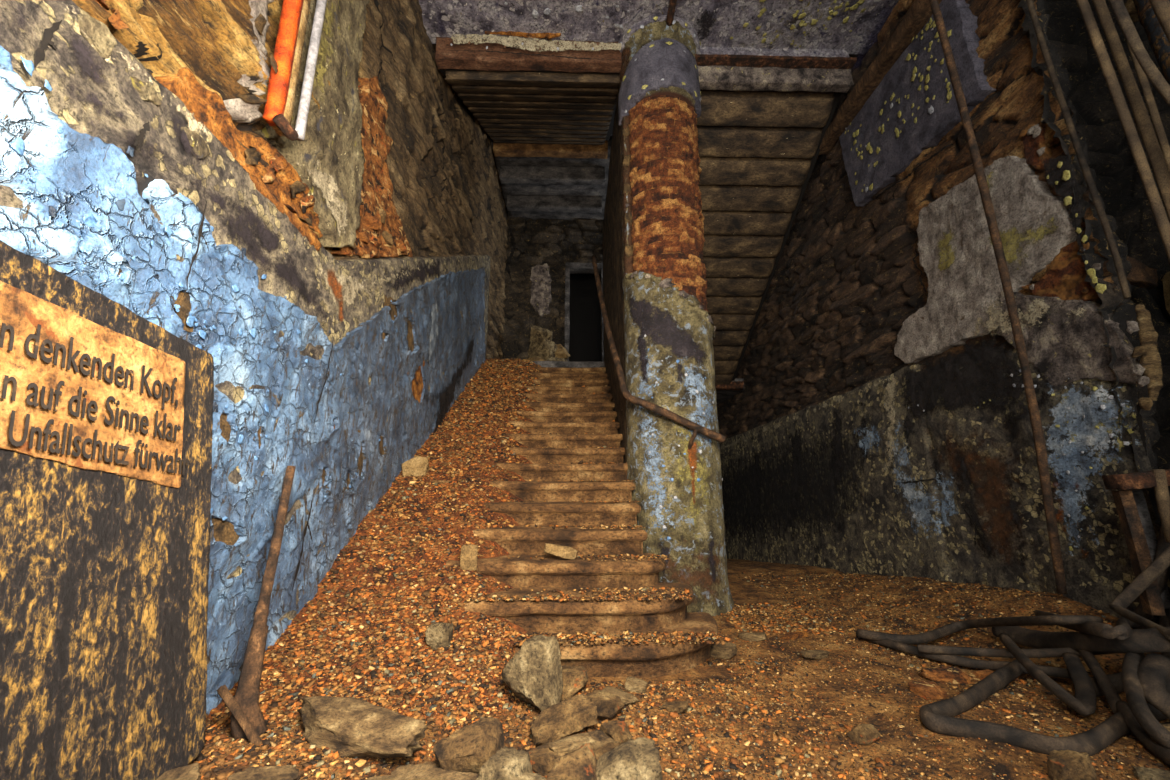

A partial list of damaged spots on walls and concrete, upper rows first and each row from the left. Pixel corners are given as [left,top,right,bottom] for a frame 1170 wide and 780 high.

peeling [254,13,267,36]
crack [134,122,150,151]
crack [183,201,209,297]
spalling [1017,124,1107,301]
peeling [0,45,486,716]
corrosion [688,442,697,503]